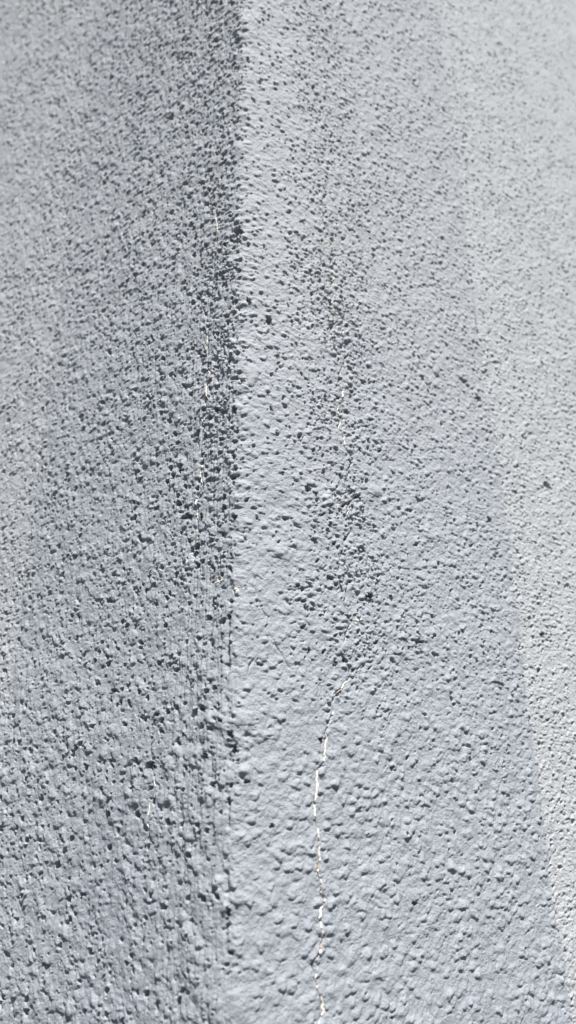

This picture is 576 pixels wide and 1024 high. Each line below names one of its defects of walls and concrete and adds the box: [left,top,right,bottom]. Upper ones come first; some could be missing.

crack [311,183,361,1024]